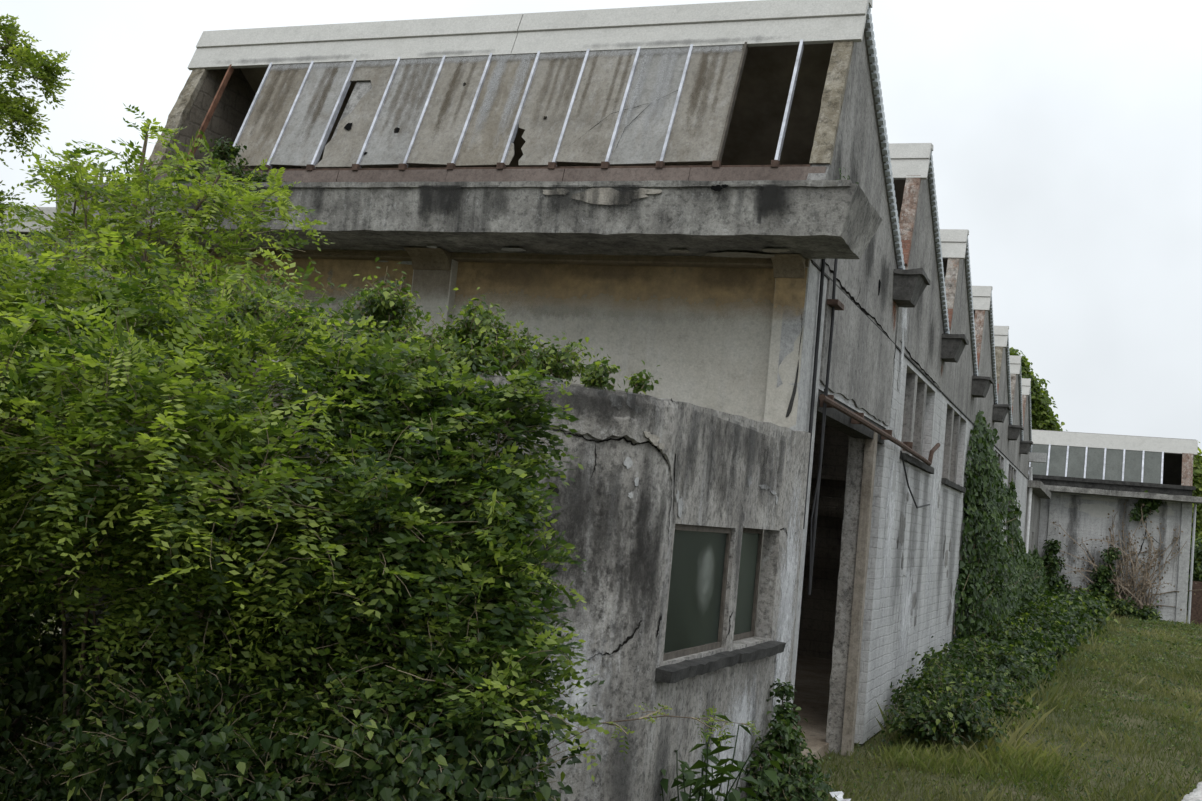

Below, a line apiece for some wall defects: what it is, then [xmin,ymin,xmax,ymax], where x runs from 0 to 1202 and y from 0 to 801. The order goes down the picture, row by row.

damp [272,45,742,119]
crack [552,429,676,540]
damp [635,497,664,580]
damp [540,645,594,752]
crack [587,615,662,660]
damp [773,603,791,718]
damp [692,713,733,801]